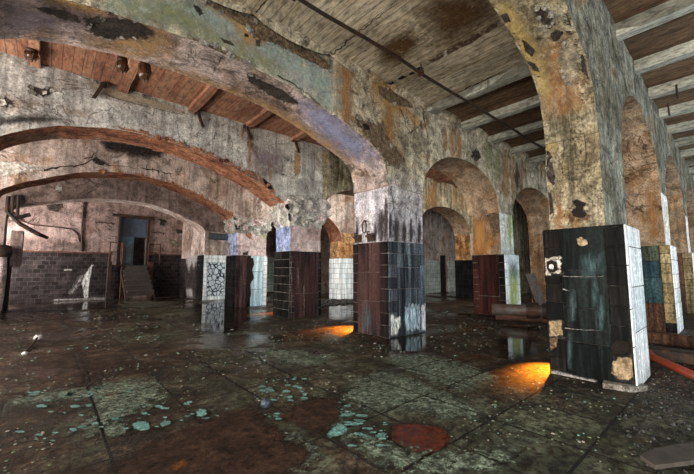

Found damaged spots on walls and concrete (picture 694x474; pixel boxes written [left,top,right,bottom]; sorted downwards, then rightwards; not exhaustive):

peeling [34,0,171,56]
peeling [193,38,299,106]
damp [381,30,420,62]
damp [423,0,546,92]
peeling [513,33,544,83]
flaking render [535,3,589,101]
flaking render [44,152,332,240]
damp [374,199,421,243]
flaking render [567,200,590,223]
peeling [549,320,579,350]
peeling [609,339,633,380]